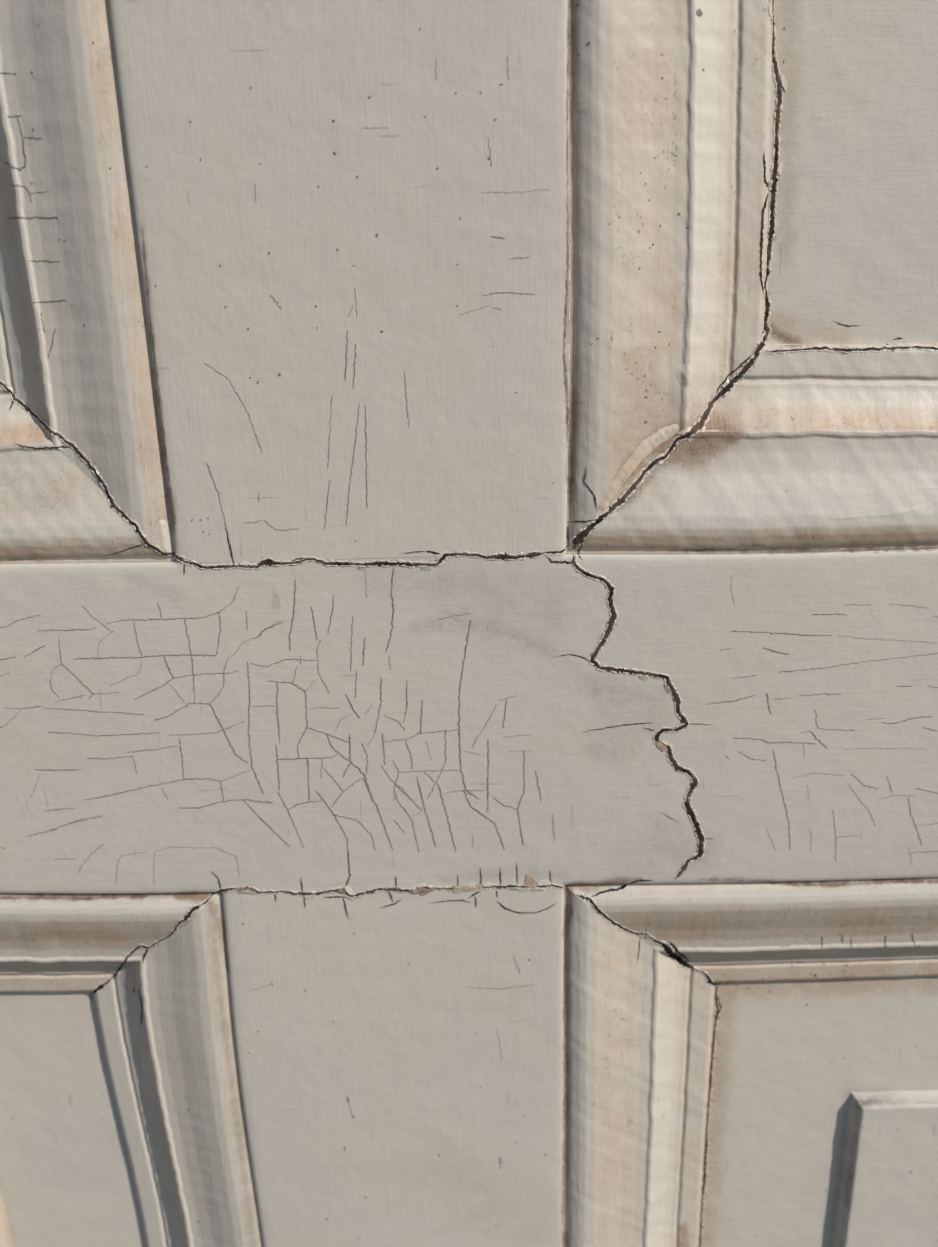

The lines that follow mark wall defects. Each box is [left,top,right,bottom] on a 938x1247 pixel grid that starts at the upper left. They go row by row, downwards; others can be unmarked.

crack [0,0,938,881]
crack [0,580,567,1000]
crack [576,879,731,1247]